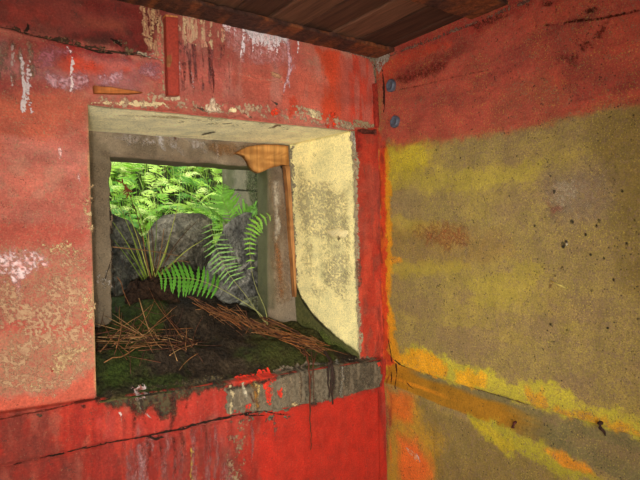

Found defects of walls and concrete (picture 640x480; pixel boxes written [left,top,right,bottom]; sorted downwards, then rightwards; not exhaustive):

crack [0,23,163,61]
leakage [179,24,299,92]
peeling [91,6,383,435]
peeling [0,240,113,402]
crack [0,397,100,420]
crack [42,411,290,458]
spalling [225,422,246,480]